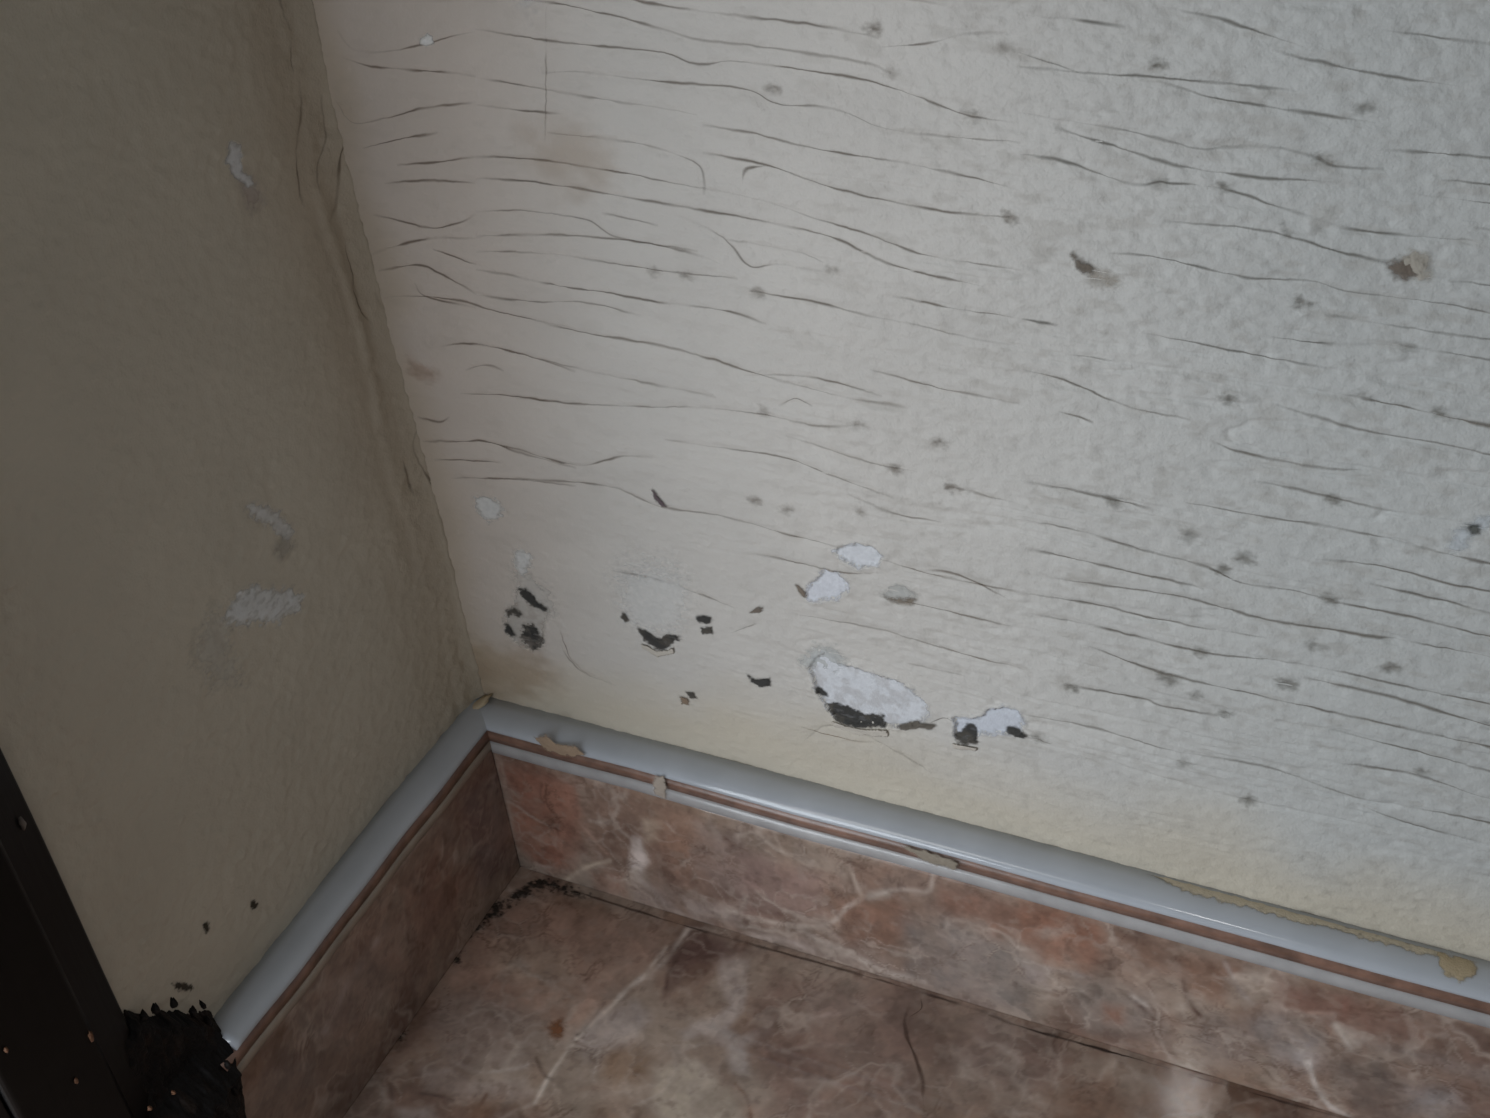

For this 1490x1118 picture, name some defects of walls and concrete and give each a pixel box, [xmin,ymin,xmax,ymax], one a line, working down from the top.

crack [555,0,688,84]
crack [786,67,888,87]
crack [819,149,878,250]
crack [401,221,525,355]
flaking render [505,550,552,650]
peeling [621,613,680,657]
peeling [696,616,713,634]
peeling [796,543,882,602]
peeling [885,585,915,603]
crack [1055,542,1490,712]
peeling [802,649,1026,751]
crack [1374,681,1490,770]